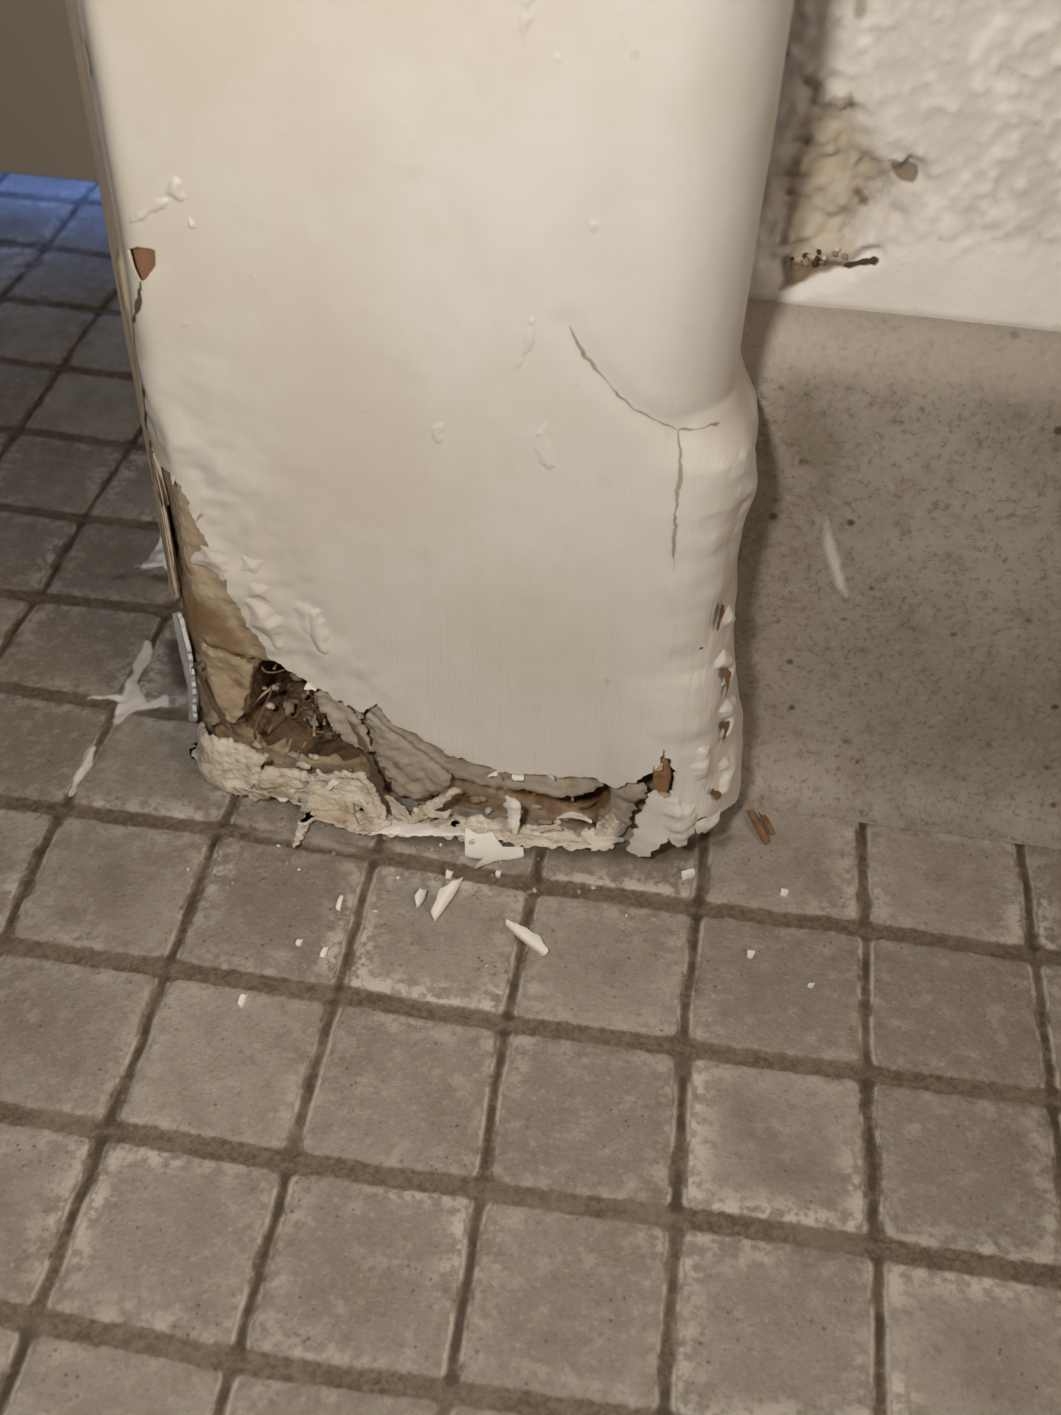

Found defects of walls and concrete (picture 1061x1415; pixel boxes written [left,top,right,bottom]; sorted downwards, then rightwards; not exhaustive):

crack [75,5,175,594]
peeling [133,247,156,280]
spalling [781,104,917,289]
crack [569,325,720,571]
spalling [134,467,737,851]
peeling [681,869,695,880]